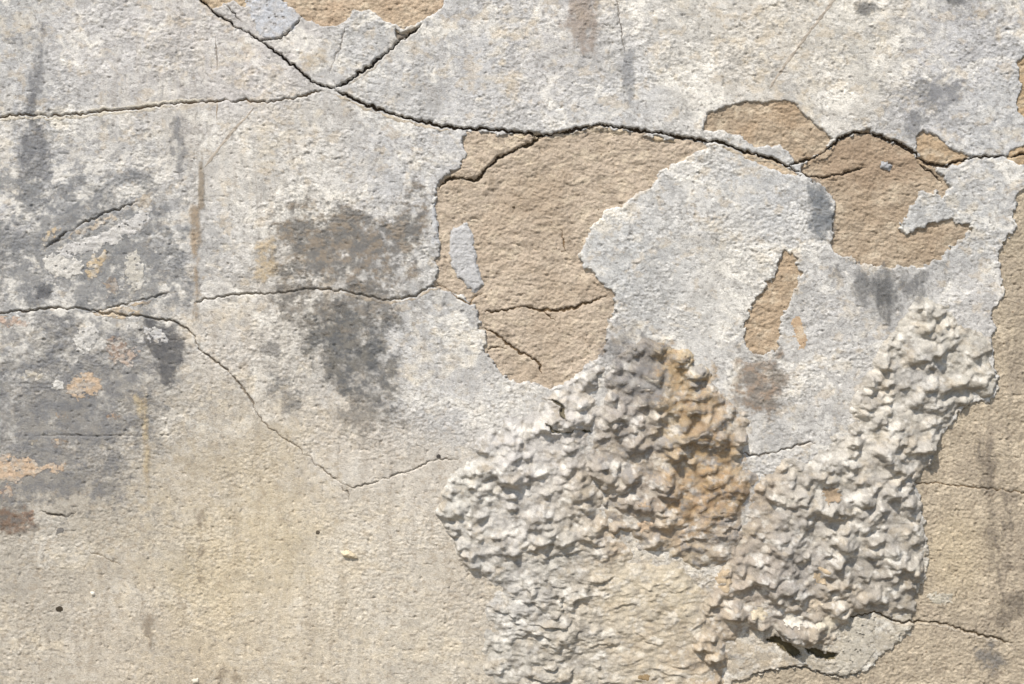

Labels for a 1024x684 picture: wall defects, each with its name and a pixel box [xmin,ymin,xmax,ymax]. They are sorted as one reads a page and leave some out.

spalling [199,0,444,41]
crack [0,0,1024,189]
crack [50,202,135,245]
leakage [0,49,193,506]
crack [0,292,456,496]
leakage [270,182,429,413]
crack [196,283,607,373]
crack [545,399,591,433]
spalling [431,100,972,389]
crack [740,441,816,457]
spalling [732,189,1024,684]
crack [917,482,1024,494]